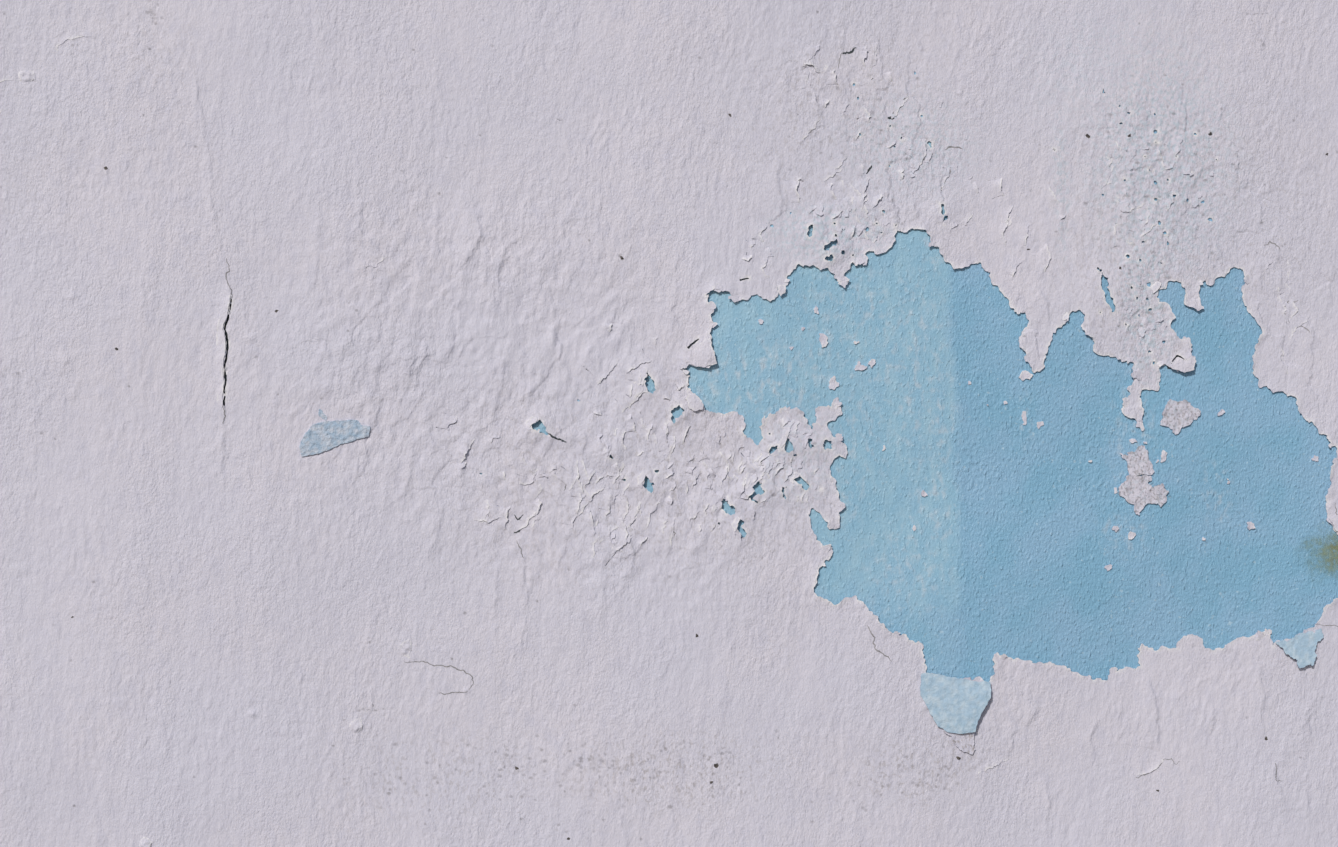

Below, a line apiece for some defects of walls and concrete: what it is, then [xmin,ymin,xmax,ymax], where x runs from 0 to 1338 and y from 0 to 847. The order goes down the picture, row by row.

peeling [787,37,893,140]
peeling [885,125,932,180]
crack [216,258,233,422]
peeling [299,409,370,457]
peeling [471,152,1338,760]